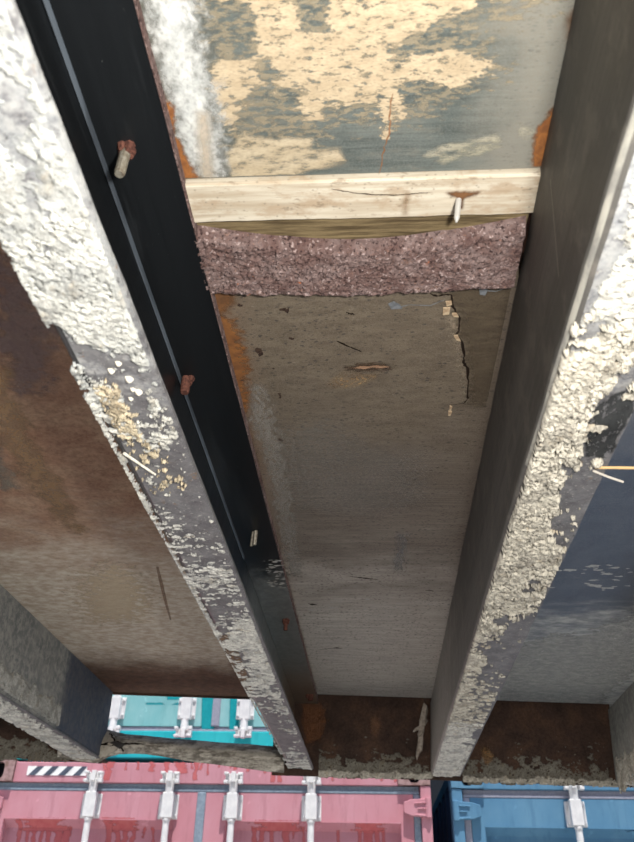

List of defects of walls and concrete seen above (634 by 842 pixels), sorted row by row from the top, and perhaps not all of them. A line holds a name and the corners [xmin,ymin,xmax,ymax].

peeling [0,0,151,372]
peeling [194,0,566,176]
corrosion [532,108,553,167]
corrosion [0,256,58,395]
corrosion [195,216,526,412]
spalling [329,362,396,388]
crack [430,288,511,416]
corrosion [156,567,171,620]
peeling [69,362,357,770]
peeling [0,696,117,762]